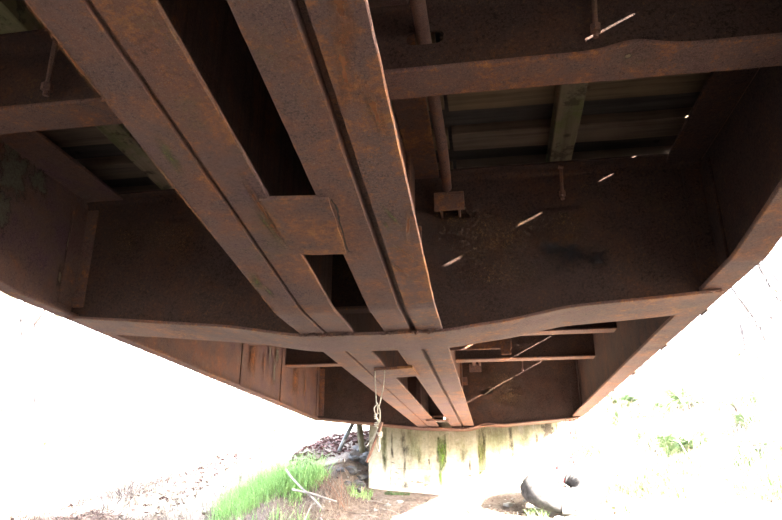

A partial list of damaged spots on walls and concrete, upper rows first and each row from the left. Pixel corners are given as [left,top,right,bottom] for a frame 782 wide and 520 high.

corrosion [27,3,106,100]
leakage [382,432,420,487]
leakage [438,439,446,486]
leakage [478,431,486,478]